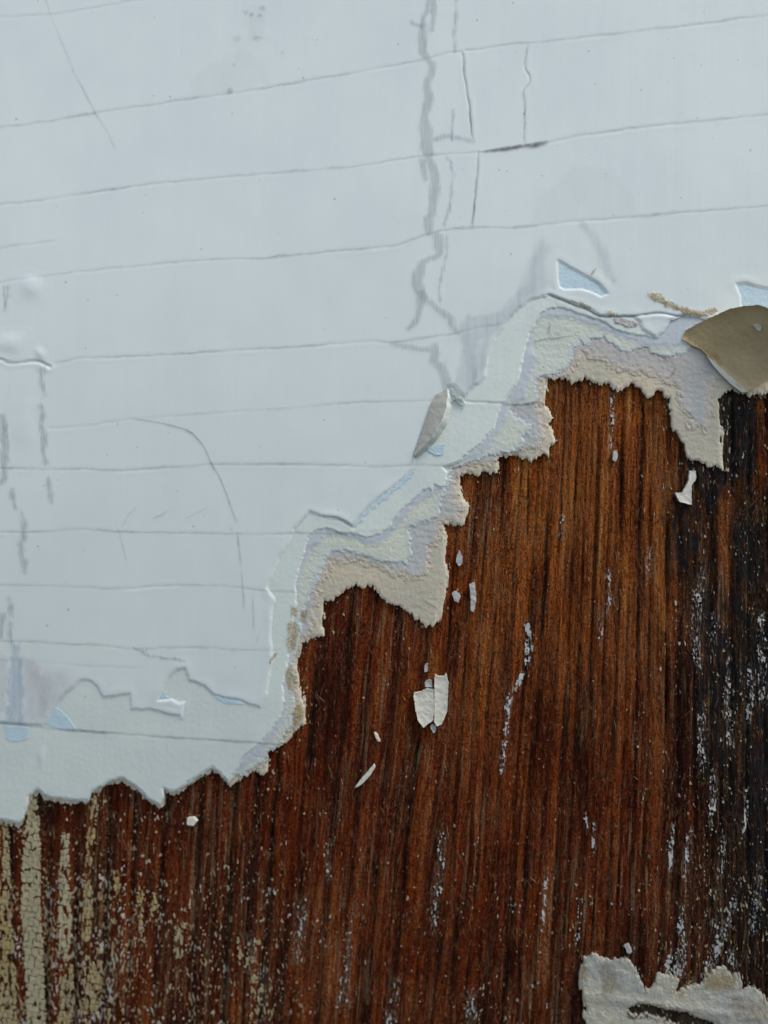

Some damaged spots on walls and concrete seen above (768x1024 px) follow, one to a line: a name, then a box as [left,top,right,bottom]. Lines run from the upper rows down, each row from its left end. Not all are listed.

crack [492,143,541,151]
peeling [0,262,768,828]
peeling [668,824,691,878]
peeling [236,937,276,1024]
peeling [664,906,686,976]
peeling [701,898,737,977]